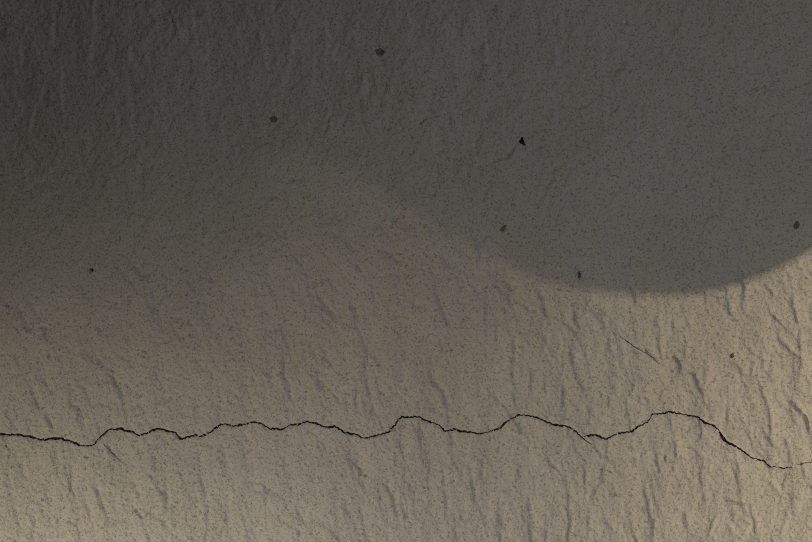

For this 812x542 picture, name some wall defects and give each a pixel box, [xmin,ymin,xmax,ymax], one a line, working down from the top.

crack [0,411,812,469]